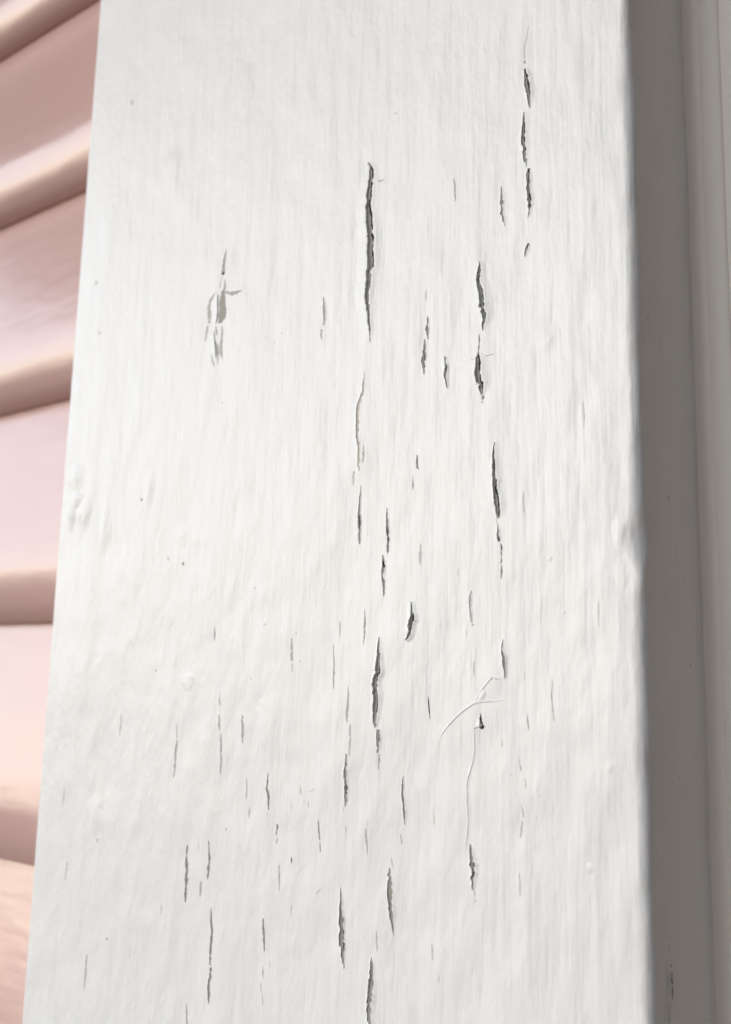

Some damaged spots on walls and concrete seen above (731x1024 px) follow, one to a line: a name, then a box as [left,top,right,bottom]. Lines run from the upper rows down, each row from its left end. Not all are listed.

crack [499,26,536,227]
peeling [210,294,218,360]
crack [354,160,385,342]
crack [420,260,494,402]
crack [490,442,525,577]
crack [316,372,435,1024]
crack [465,713,537,903]